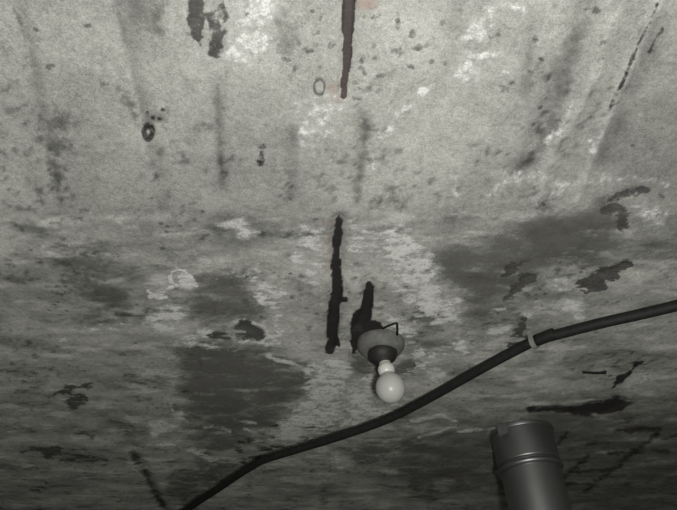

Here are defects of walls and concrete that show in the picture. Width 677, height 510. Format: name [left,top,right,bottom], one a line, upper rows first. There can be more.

spalling [186,0,228,58]
crack [610,28,663,108]
leakage [293,93,343,157]
leakage [377,84,433,140]
spalling [600,186,651,230]
leakage [289,224,333,295]
crack [325,216,383,354]
leakage [344,197,618,387]
spalling [575,260,634,294]
spalling [207,320,265,341]
leakage [125,267,422,506]
spalling [527,361,643,417]